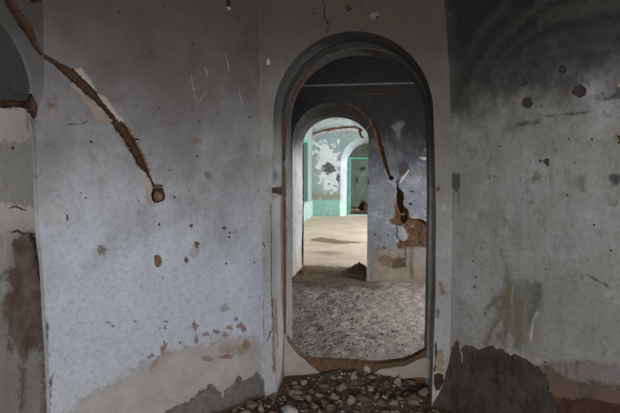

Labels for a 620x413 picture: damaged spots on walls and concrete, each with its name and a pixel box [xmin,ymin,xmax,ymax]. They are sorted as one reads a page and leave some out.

crack [4,0,155,193]
spalling [572,84,586,98]
crack [312,90,419,180]
spalling [272,48,394,334]
spalling [388,161,426,249]
peeling [148,339,170,369]
spalling [164,372,265,413]
peeling [192,317,247,344]
spalling [432,340,620,413]